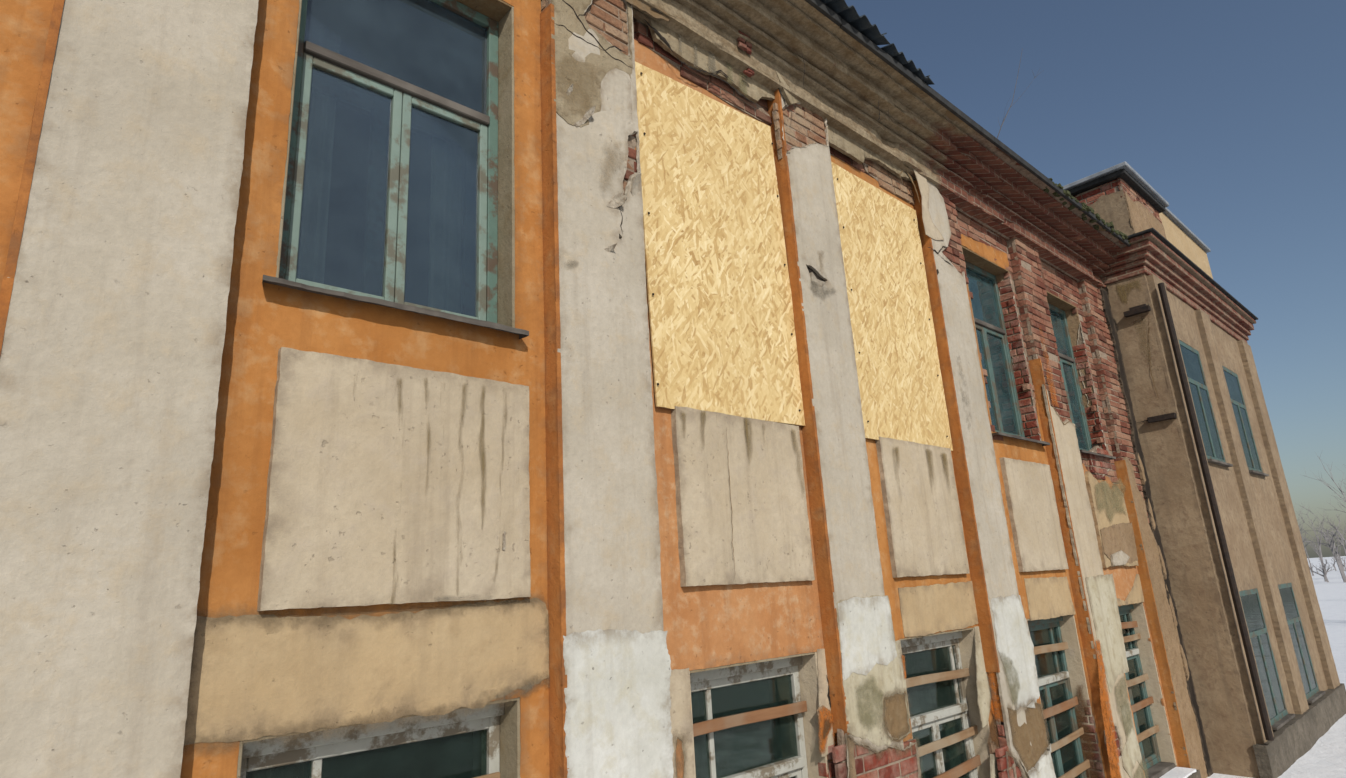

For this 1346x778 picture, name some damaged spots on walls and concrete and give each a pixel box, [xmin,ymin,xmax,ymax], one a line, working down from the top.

crack [551,0,632,68]
crack [644,19,759,107]
flaking render [584,0,829,160]
damp [927,449,949,477]
peeling [1100,523,1138,566]
peeling [675,737,686,778]
flaking render [816,691,921,778]
peeling [988,701,1051,778]